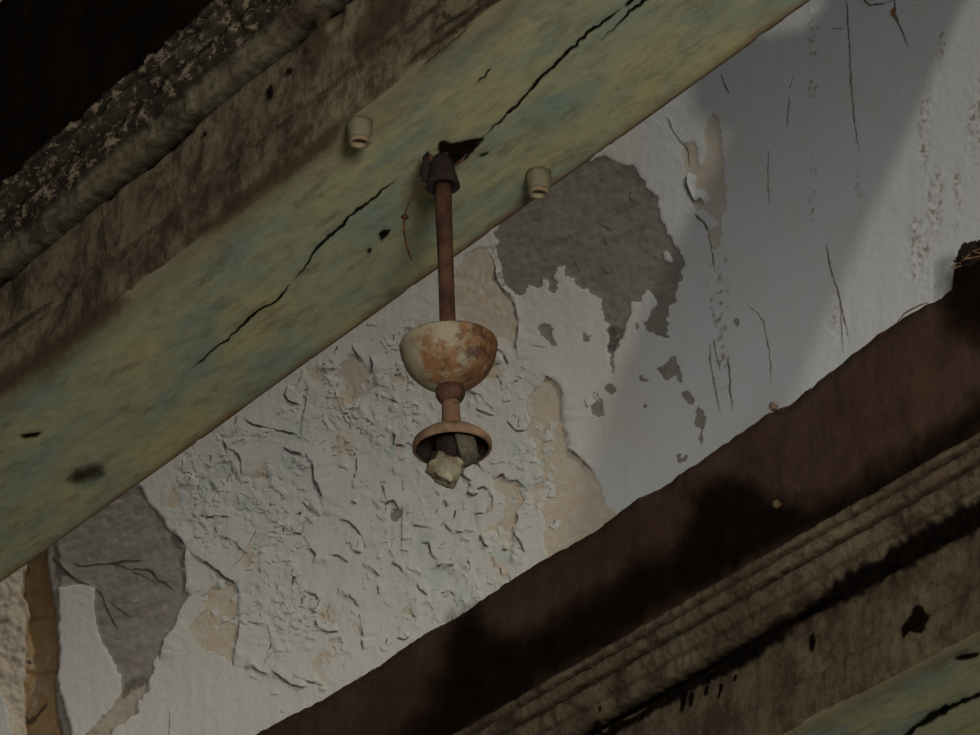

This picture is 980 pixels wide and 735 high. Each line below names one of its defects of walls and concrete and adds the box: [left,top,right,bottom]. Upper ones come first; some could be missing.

crack [489,0,646,131]
crack [833,0,905,144]
peeling [682,115,726,249]
crack [195,182,394,366]
peeling [223,395,303,477]
peeling [316,355,377,400]
spalling [434,156,685,596]
spalling [657,356,706,444]
peeling [391,509,402,522]
spalling [56,484,276,735]
crack [904,692,980,735]